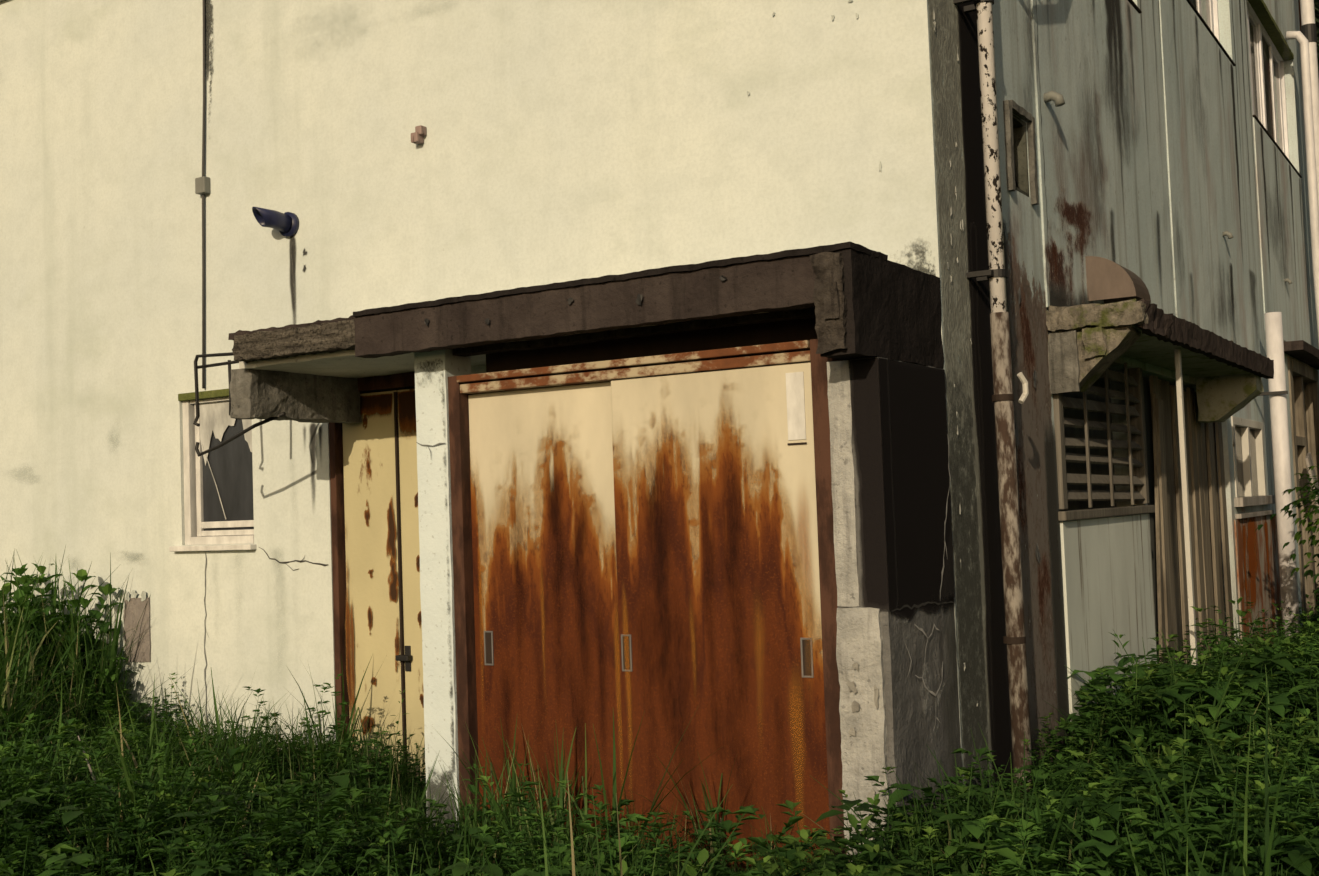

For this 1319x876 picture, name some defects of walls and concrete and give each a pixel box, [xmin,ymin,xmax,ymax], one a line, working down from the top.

water stain [1093,0,1175,173]
water stain [290,236,307,324]
rust [1045,197,1091,300]
water stain [1050,285,1093,307]
rust [360,390,417,435]
crack [259,547,328,571]
rust [368,497,399,602]
crack [892,374,965,801]
rust [1243,512,1270,622]
rust [345,565,374,746]
rust [470,413,830,871]